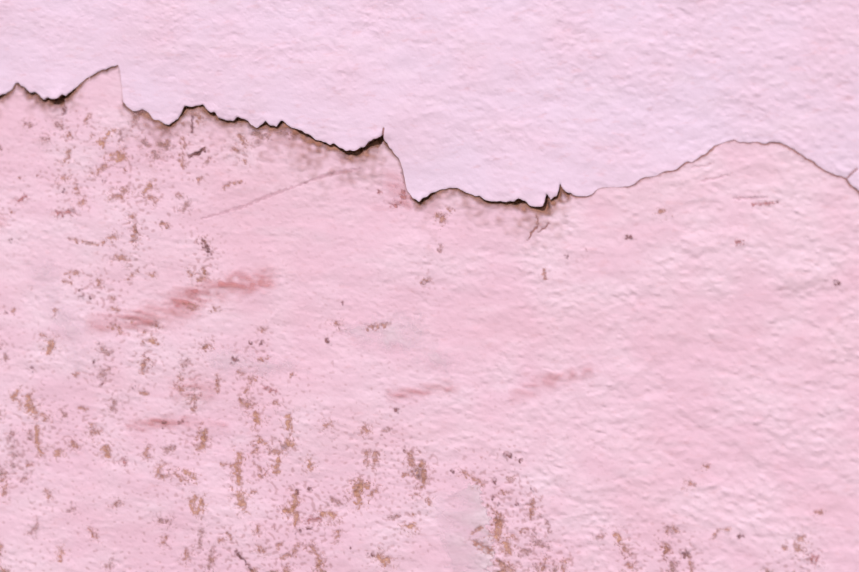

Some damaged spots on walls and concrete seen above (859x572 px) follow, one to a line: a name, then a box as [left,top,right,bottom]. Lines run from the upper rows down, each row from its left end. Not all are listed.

peeling [0,58,572,208]
peeling [11,390,47,456]
peeling [232,357,279,426]
peeling [189,495,205,515]
peeling [220,414,295,512]
peeling [277,543,326,572]
peeling [282,487,342,531]
peeling [352,479,377,510]
peeling [402,450,430,505]
peeling [472,481,566,572]